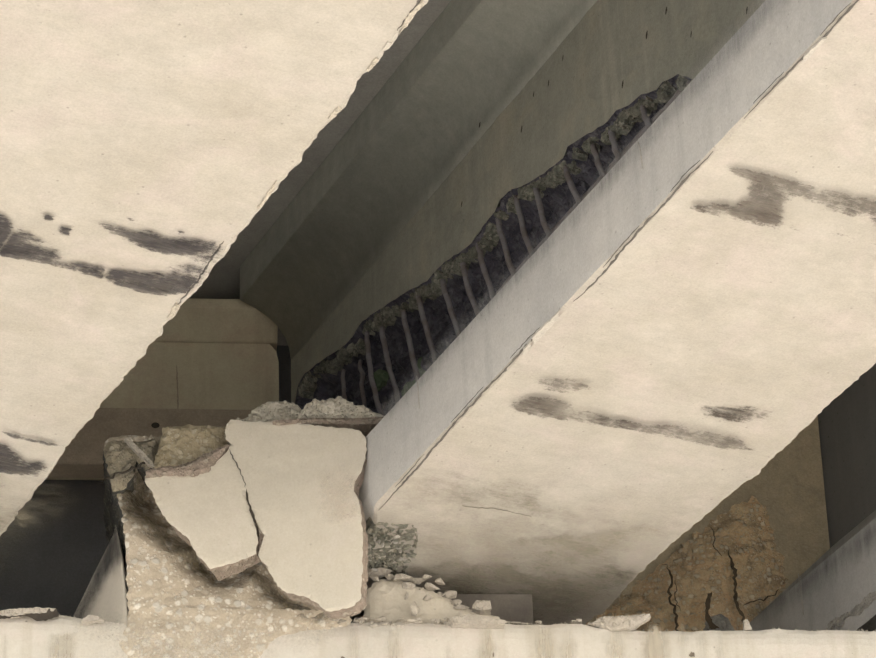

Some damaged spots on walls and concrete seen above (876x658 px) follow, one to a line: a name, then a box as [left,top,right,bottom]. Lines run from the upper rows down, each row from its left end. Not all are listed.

spalling [367,0,424,72]
leakage [694,168,876,227]
spalling [167,241,224,318]
spalling [236,74,693,437]
leakage [514,379,752,450]
leakage [705,406,763,422]
spalling [366,517,418,580]
peeling [449,613,505,629]
crack [662,564,681,631]
crack [711,528,779,623]
spalling [827,591,876,632]